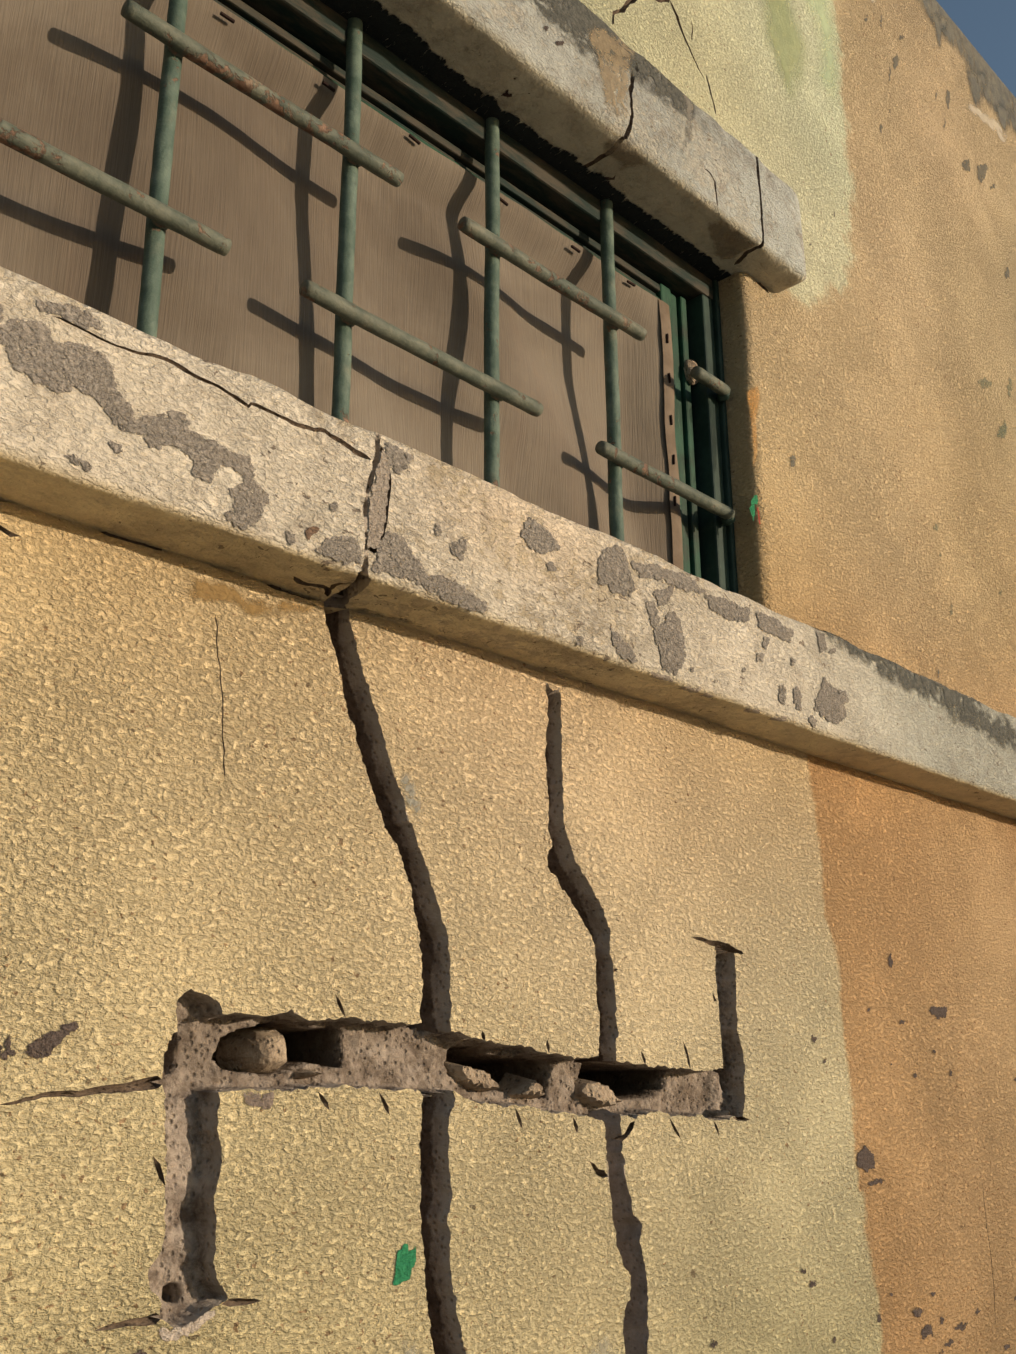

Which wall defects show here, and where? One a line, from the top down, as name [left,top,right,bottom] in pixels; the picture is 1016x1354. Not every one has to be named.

crack [583,63,638,180]
crack [612,0,716,114]
crack [734,157,769,293]
peeling [962,159,995,189]
peeling [0,299,269,530]
crack [0,525,19,537]
crack [54,316,452,1034]
crack [545,683,619,1063]
crack [419,1089,466,1354]
crack [582,1109,649,1354]